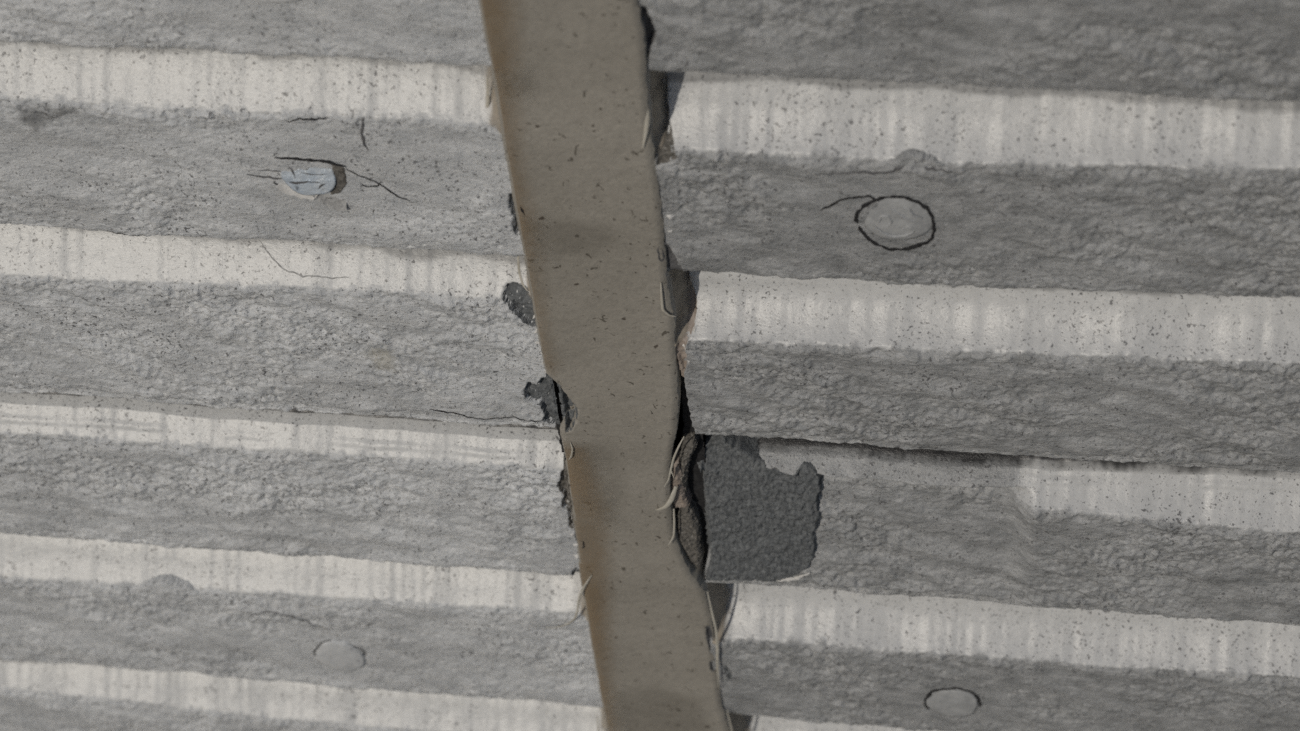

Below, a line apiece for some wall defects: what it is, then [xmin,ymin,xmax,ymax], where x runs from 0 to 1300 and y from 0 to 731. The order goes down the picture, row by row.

peeling [274,157,347,211]
spalling [502,282,561,424]
spalling [697,434,823,582]